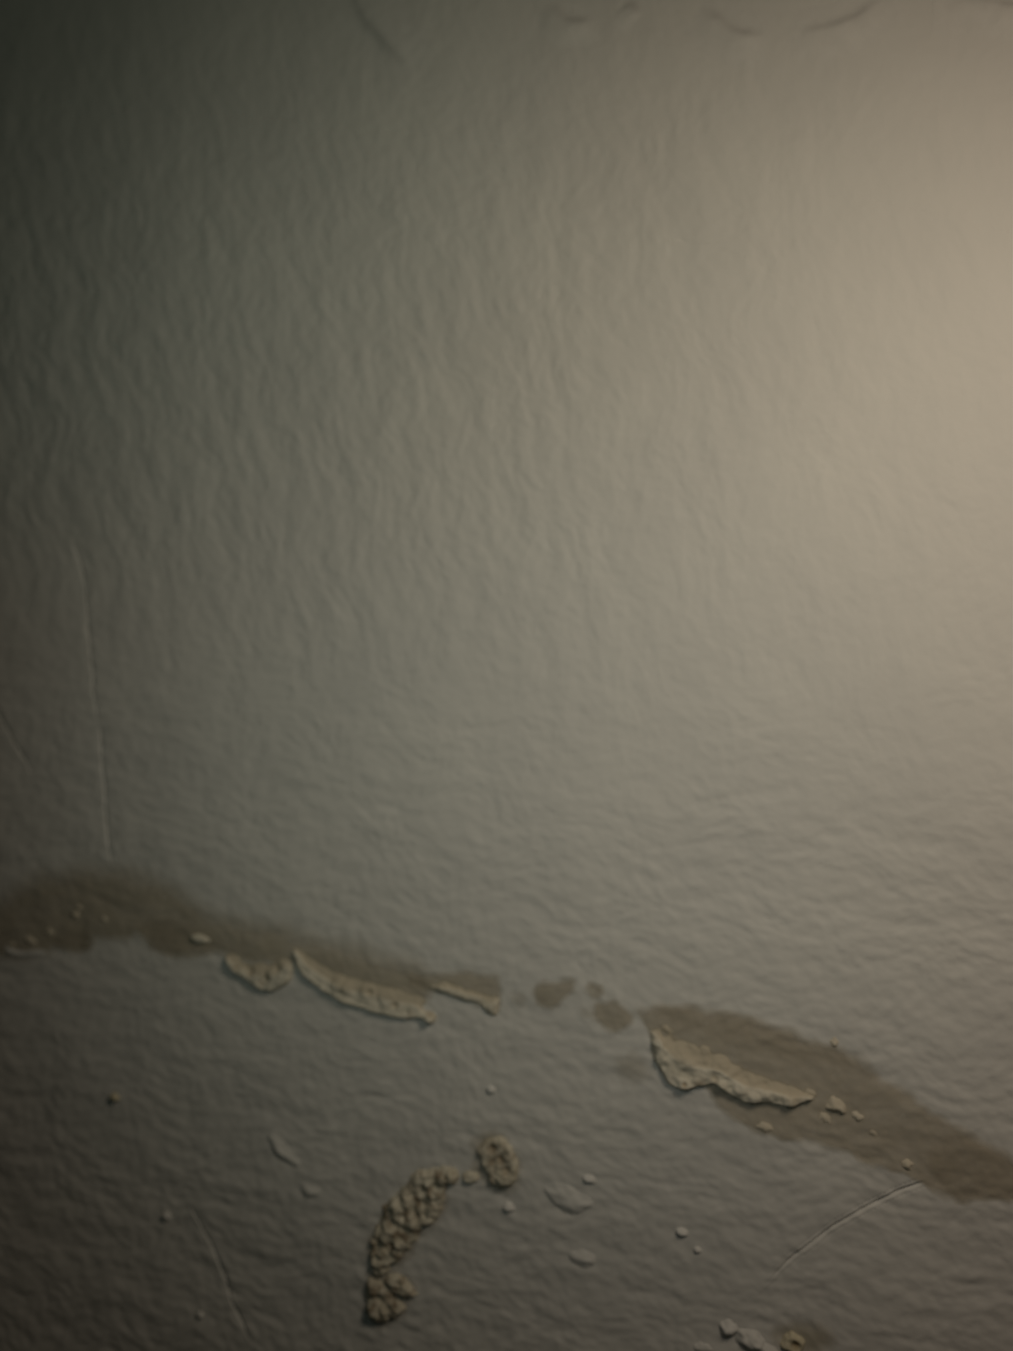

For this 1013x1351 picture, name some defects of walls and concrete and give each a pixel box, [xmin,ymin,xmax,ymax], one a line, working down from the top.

water stain [0,878,498,998]
water stain [648,1009,1013,1200]